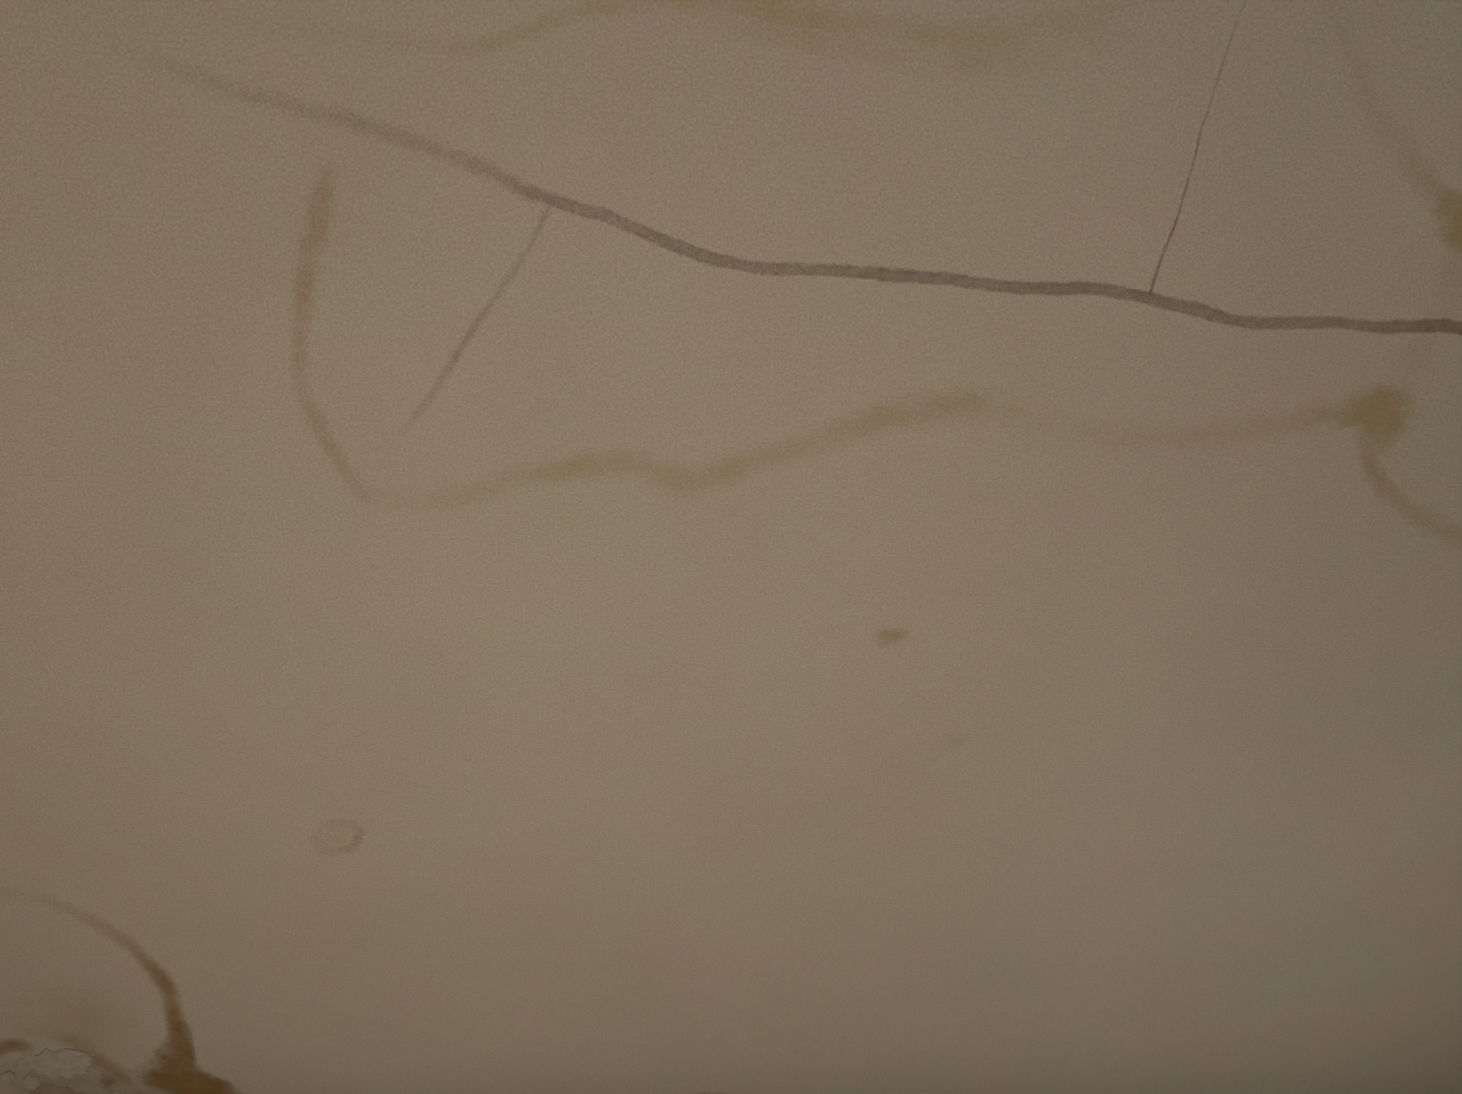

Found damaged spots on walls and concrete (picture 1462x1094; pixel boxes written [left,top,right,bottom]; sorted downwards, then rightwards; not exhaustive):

crack [99,0,1462,433]
water stain [288,0,1462,550]